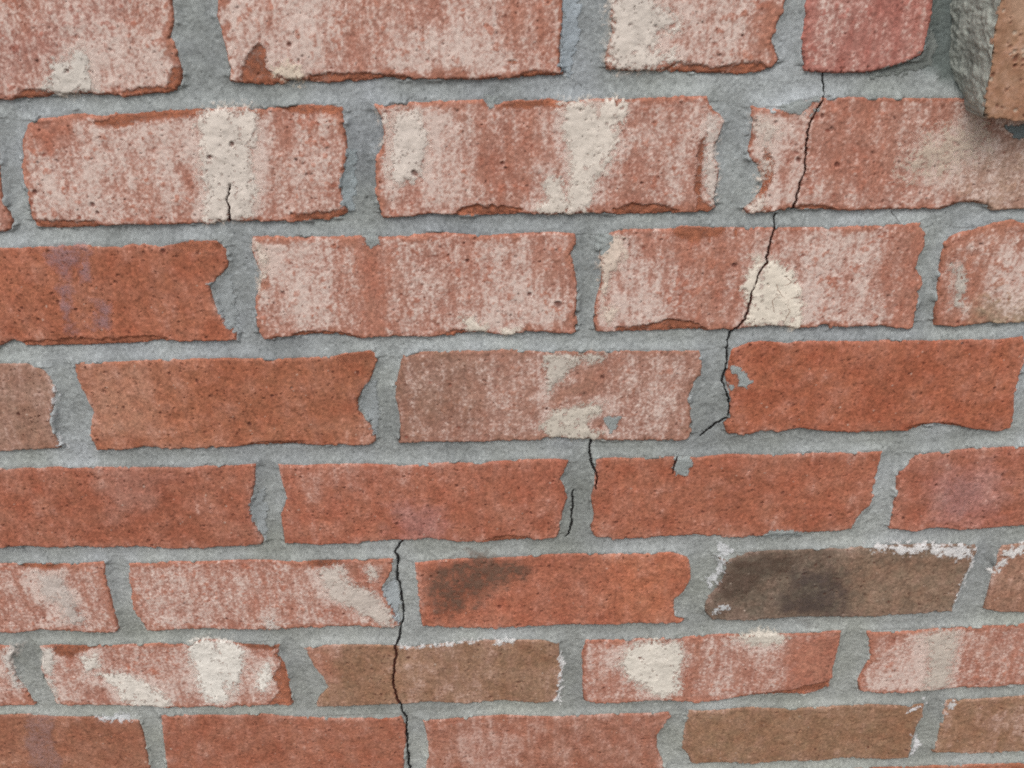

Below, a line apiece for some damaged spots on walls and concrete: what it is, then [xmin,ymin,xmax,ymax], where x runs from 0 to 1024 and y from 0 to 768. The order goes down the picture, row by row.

crack [700,72,824,436]
crack [566,439,598,536]
efflorescence [707,541,734,588]
efflorescence [864,540,977,602]
crack [392,539,411,768]